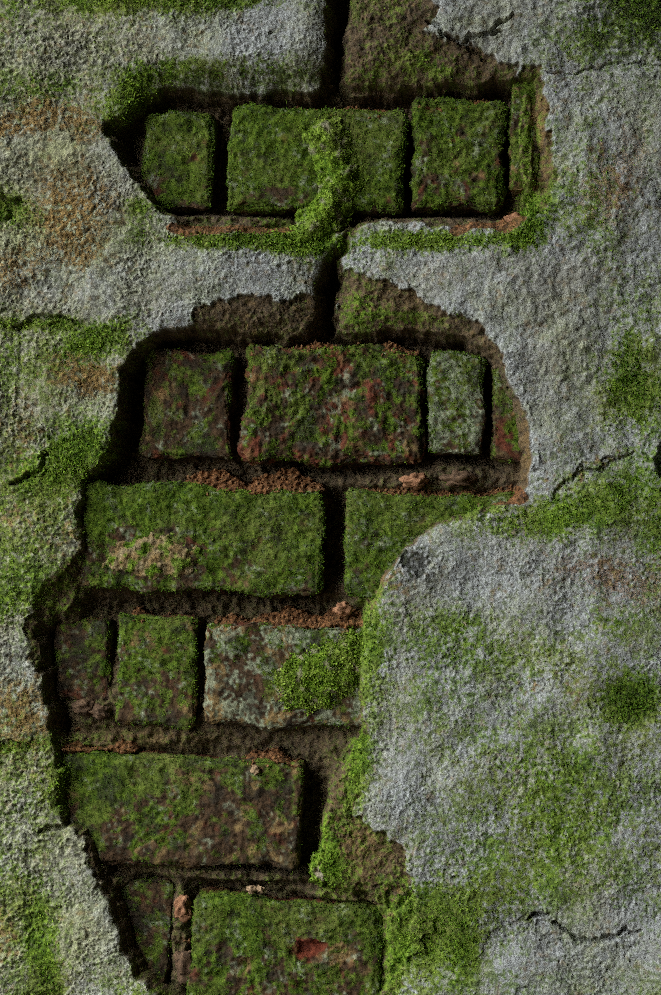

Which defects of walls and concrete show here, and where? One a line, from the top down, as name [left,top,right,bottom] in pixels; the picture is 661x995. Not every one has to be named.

crack [425,13,515,62]
flaking render [102,0,560,241]
crack [553,451,635,501]
flaking render [23,294,317,995]
flaking render [318,269,535,995]
spalling [289,936,328,964]
crack [527,912,643,947]